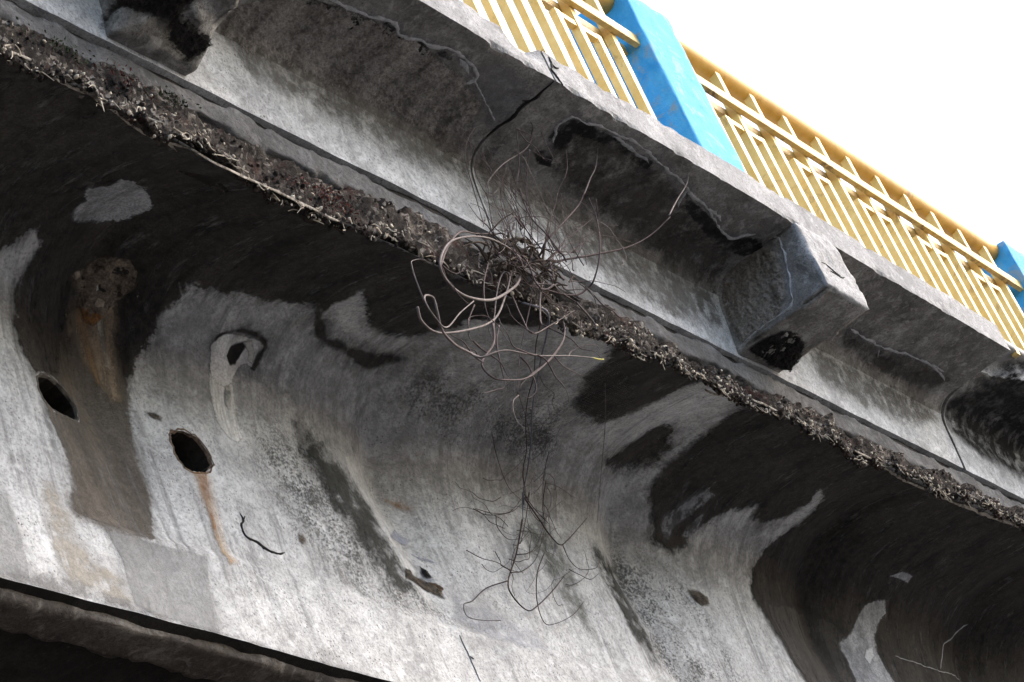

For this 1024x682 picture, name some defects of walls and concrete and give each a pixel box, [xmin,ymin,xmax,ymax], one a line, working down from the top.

crack [487,57,563,137]
spalling [0,0,1024,537]
rust [68,304,120,401]
damp [404,345,725,455]
crack [240,513,285,555]
damp [594,399,1024,682]